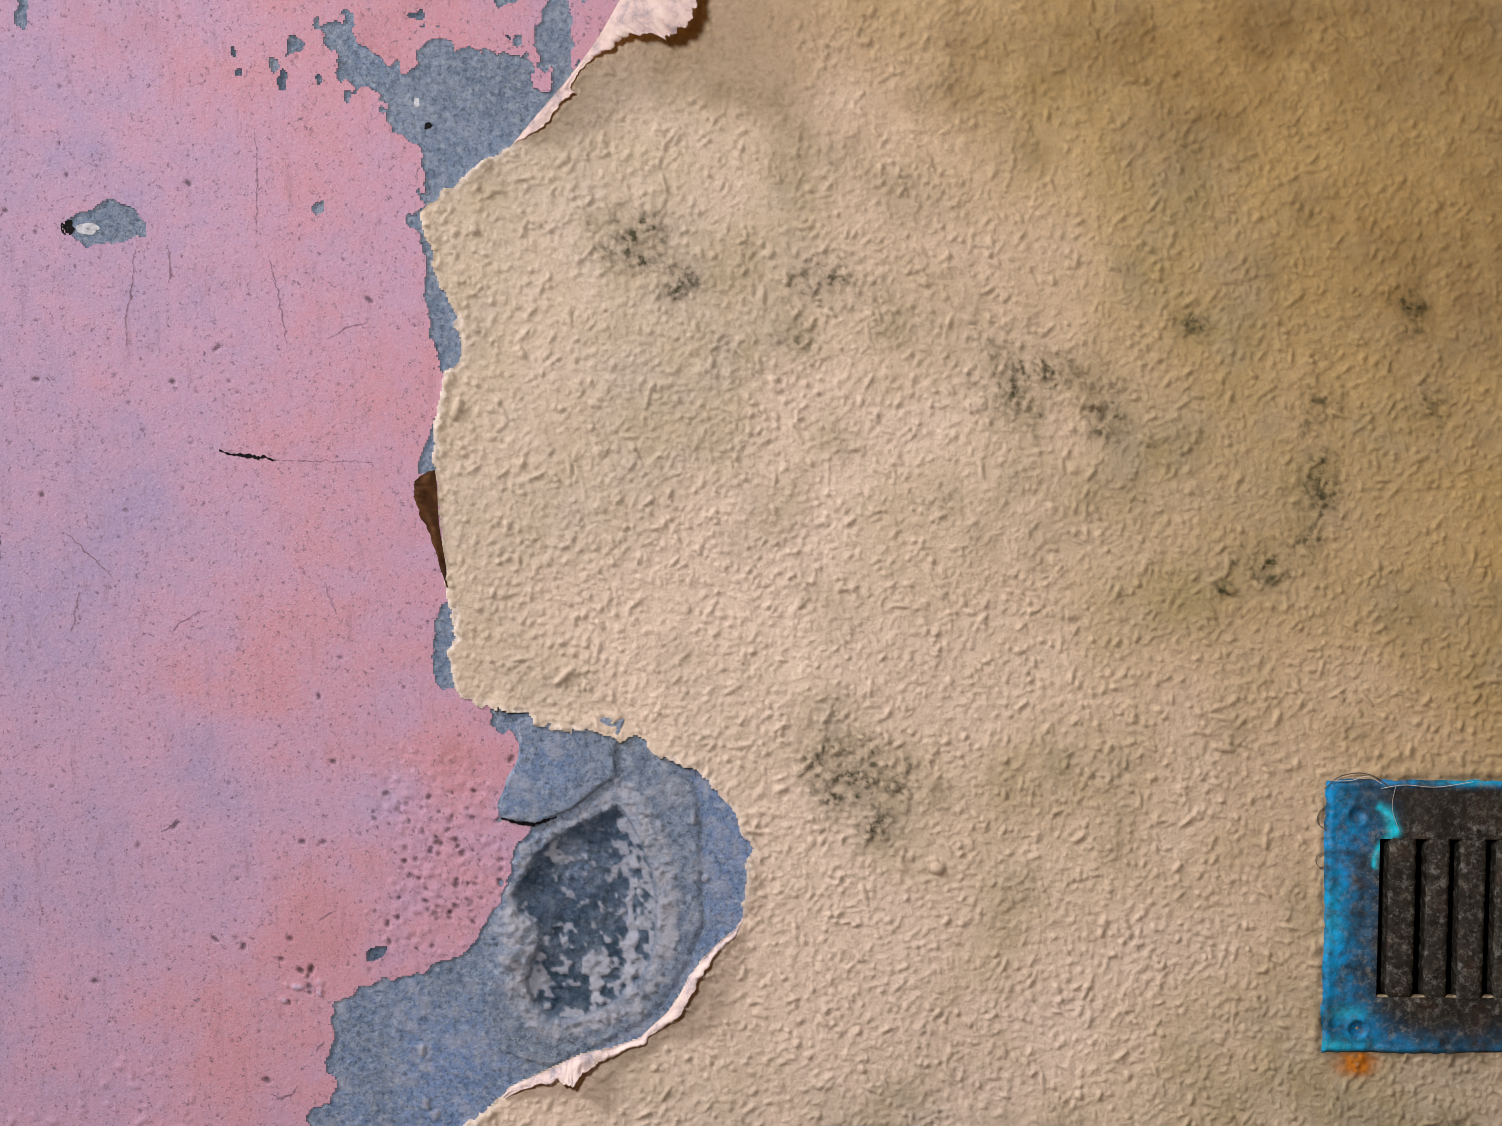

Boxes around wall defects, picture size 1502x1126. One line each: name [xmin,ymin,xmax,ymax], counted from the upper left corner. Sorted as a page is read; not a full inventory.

peeling [67,199,146,248]
peeling [269,0,726,373]
crack [219,449,372,463]
peeling [413,418,456,690]
crack [501,816,557,827]
peeling [306,707,754,1126]